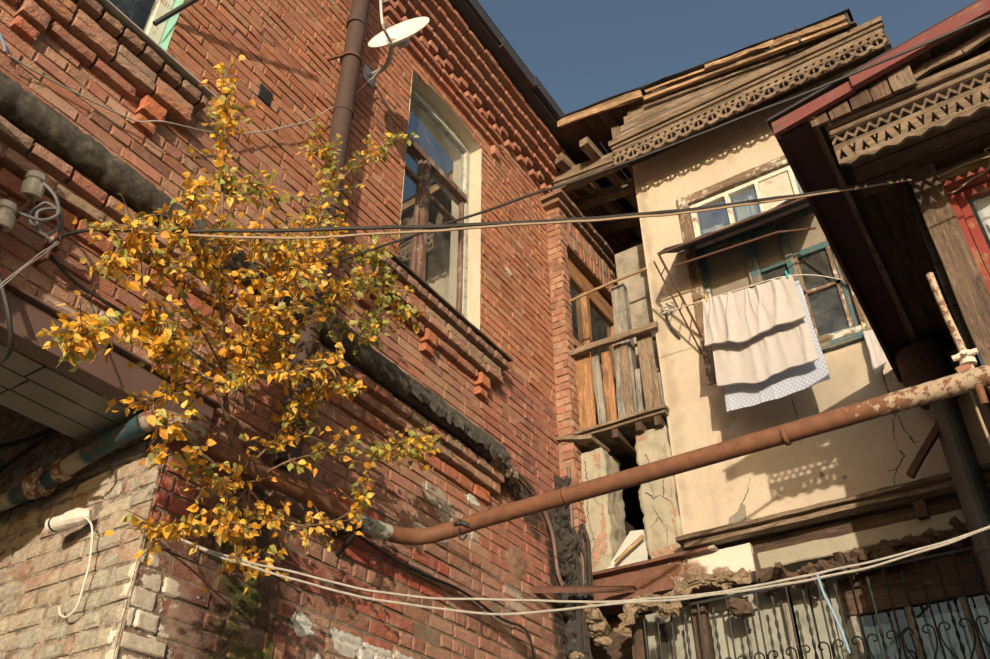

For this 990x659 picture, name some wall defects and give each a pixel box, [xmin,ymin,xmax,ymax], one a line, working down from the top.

crack [881,369,937,485]
damp [191,527,292,659]
peeling [289,612,315,637]
peeling [326,625,414,659]
flaking render [591,504,608,568]
crack [645,454,669,544]
flaking render [651,488,679,557]
spalling [756,516,971,594]